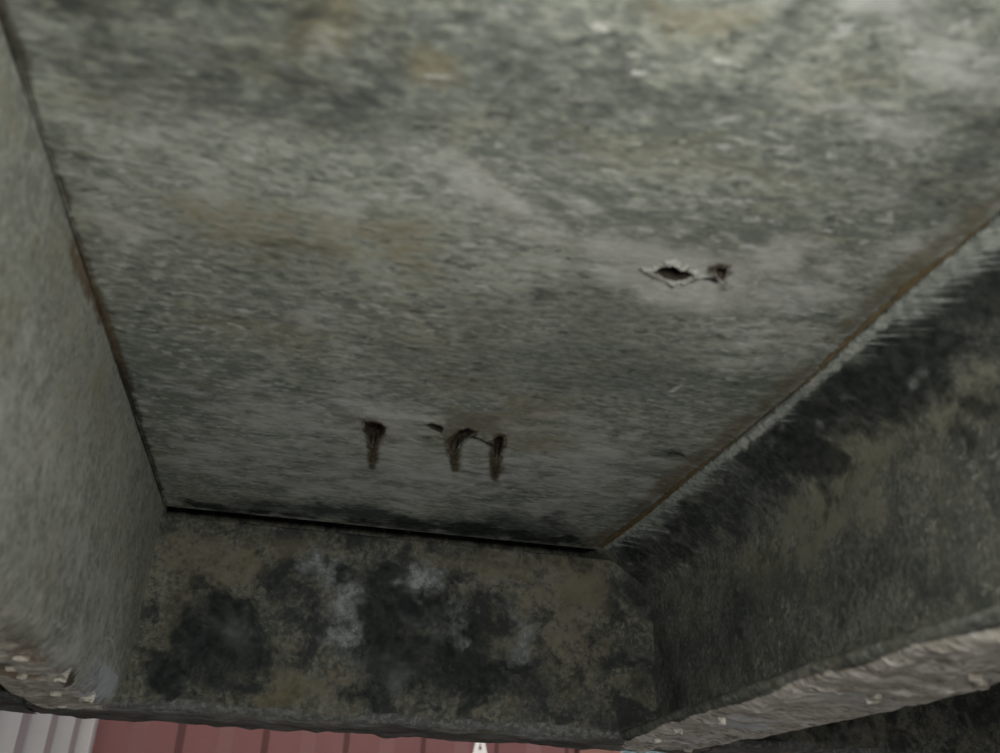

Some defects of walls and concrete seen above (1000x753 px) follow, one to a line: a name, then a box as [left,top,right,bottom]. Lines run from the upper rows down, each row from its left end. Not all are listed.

spalling [641,259,730,288]
damp [604,211,1000,565]
rust [490,435,505,480]